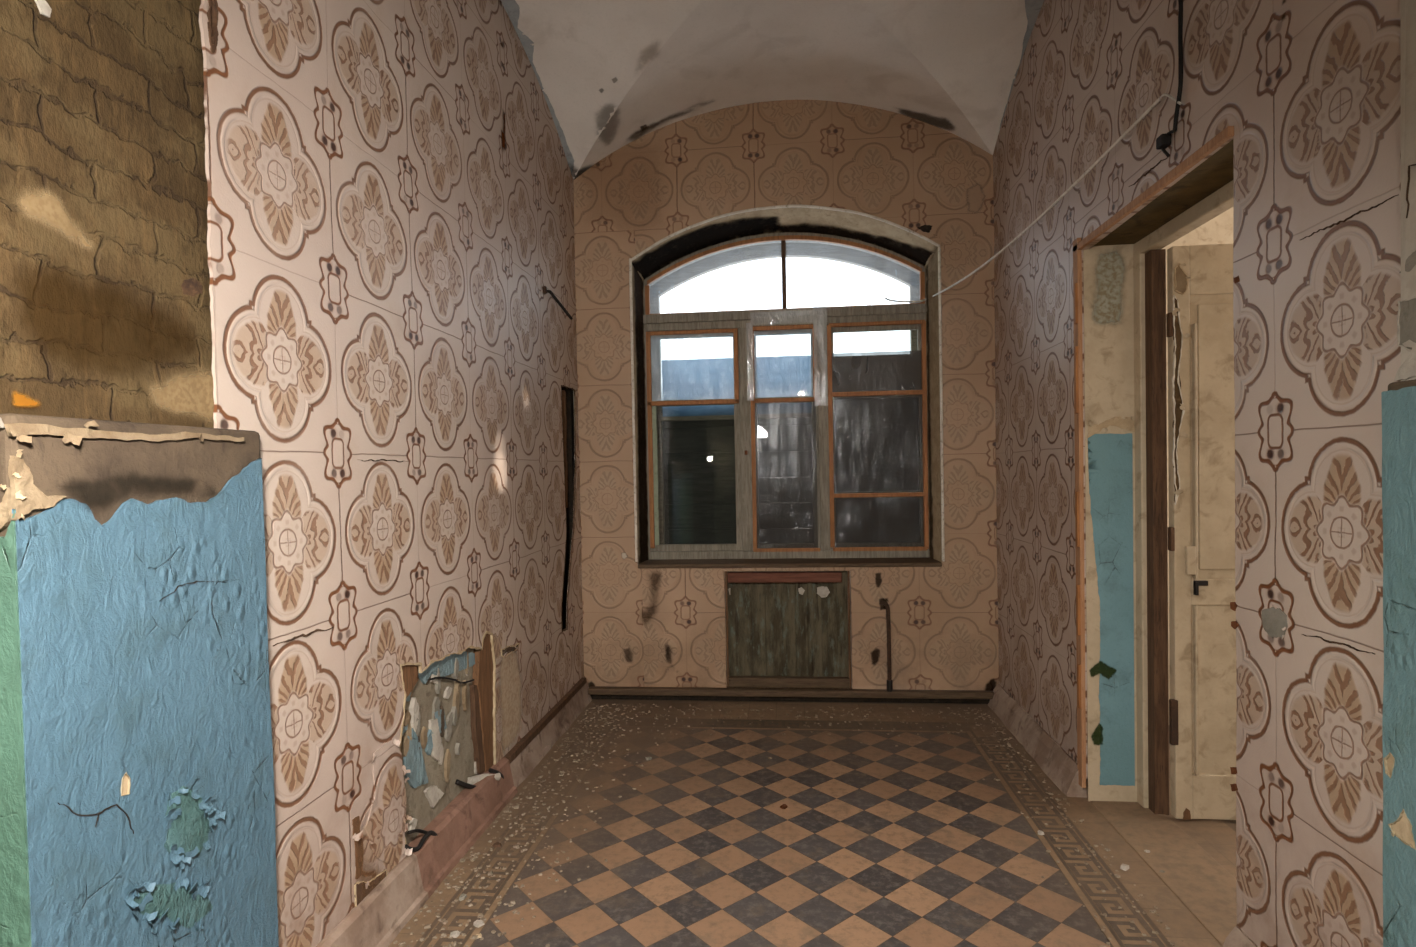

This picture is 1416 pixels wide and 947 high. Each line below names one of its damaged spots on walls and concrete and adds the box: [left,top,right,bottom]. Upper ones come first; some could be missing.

peeling [1000,0,1044,127]
flaking render [1397,296,1416,353]
flaking render [0,418,244,531]
flaking render [392,631,520,856]
spalling [354,869,387,907]